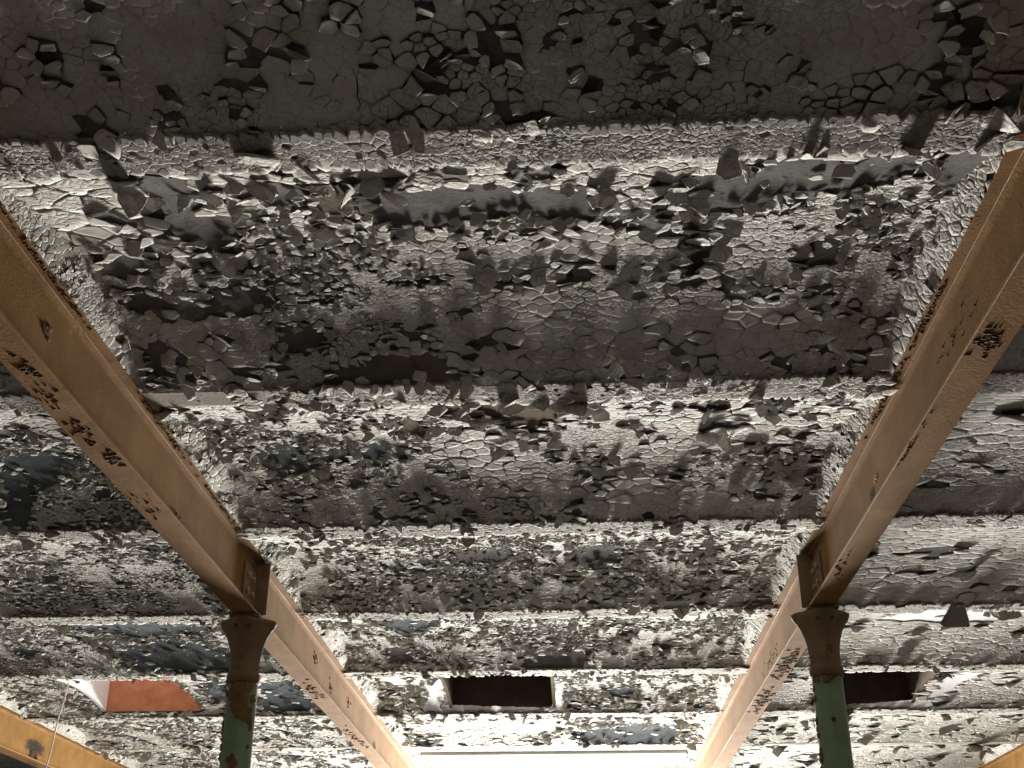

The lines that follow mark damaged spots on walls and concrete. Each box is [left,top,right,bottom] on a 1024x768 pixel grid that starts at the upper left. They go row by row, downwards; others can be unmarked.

crack [0,68,1024,183]
peeling [0,0,1024,535]
corrosion [9,354,61,410]
crack [228,324,900,411]
corrosion [936,304,1003,364]
corrosion [63,420,126,467]
peeling [0,410,375,768]
peeling [726,323,1024,768]
peeling [250,526,813,768]